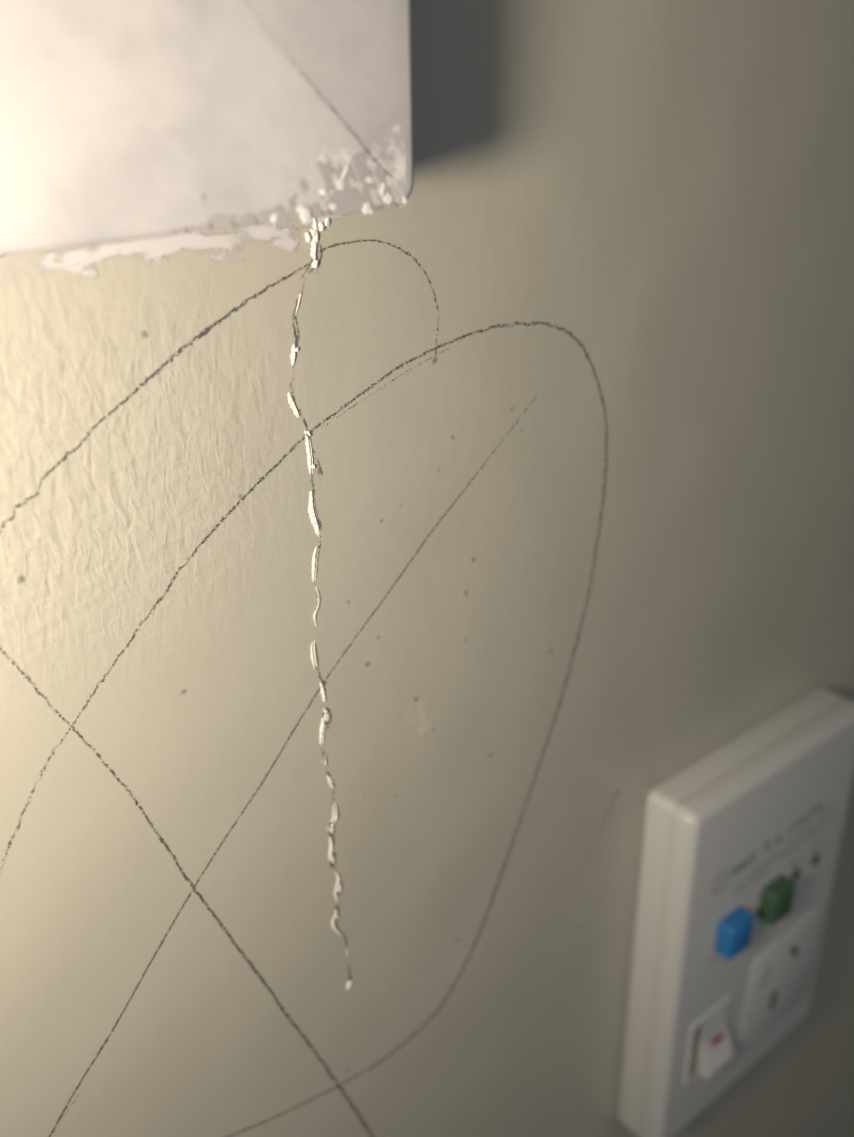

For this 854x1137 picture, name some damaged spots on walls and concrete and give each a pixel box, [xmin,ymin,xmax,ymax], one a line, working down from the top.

crack [287,217,353,990]